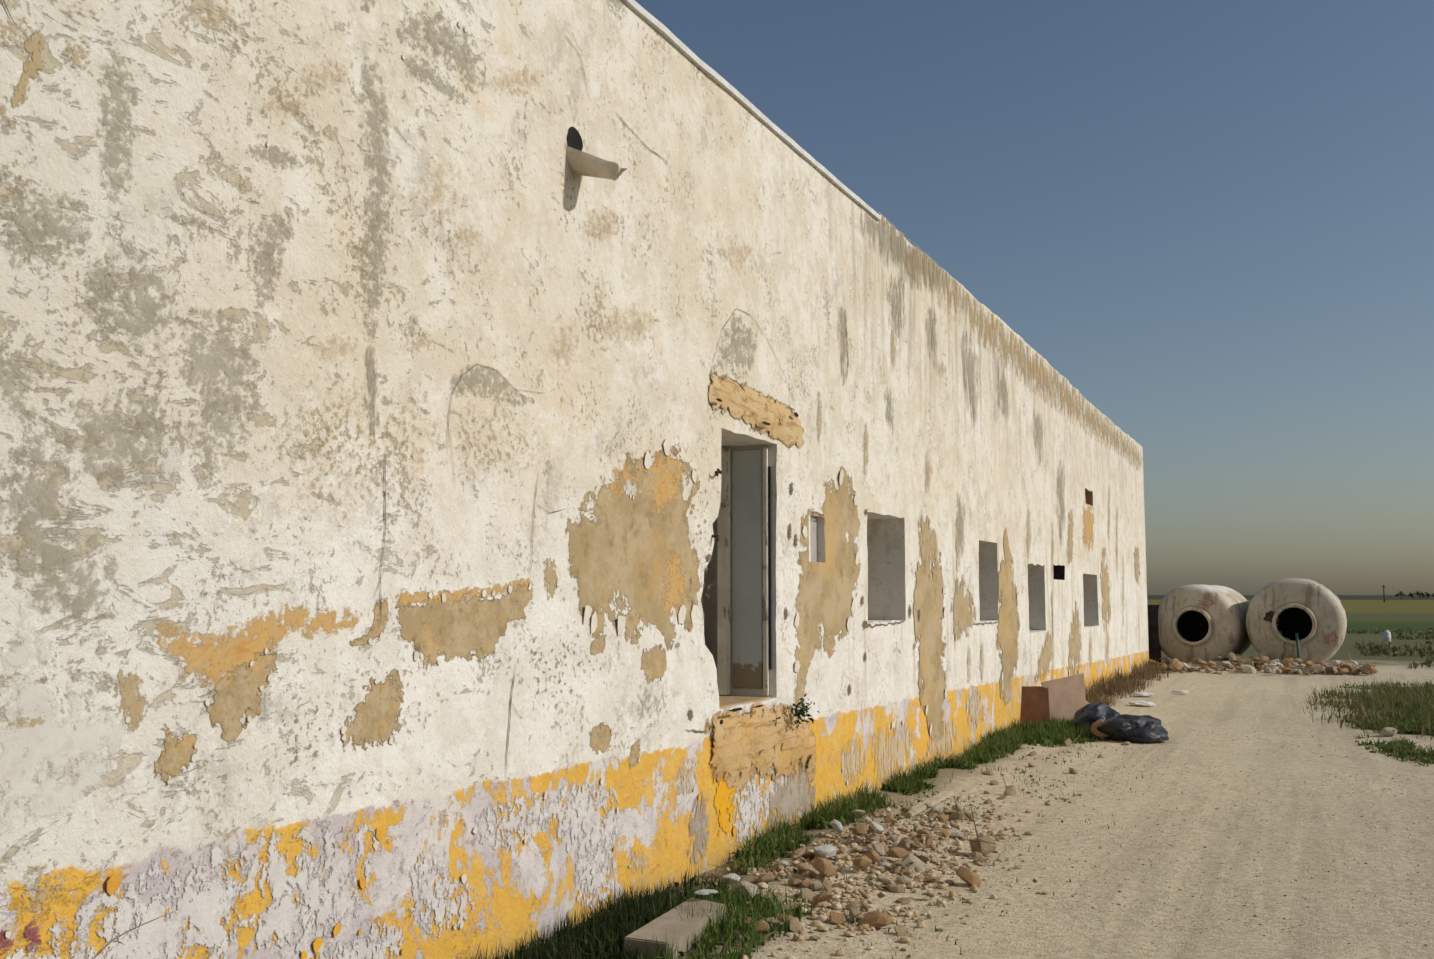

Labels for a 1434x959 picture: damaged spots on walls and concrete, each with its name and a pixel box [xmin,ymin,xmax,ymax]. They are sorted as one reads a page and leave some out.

flaking render [708,371,805,450]
flaking render [114,670,147,731]
flaking render [154,648,278,784]
flaking render [283,669,404,777]
flaking render [349,438,712,697]
flaking render [677,467,868,864]
flaking render [842,510,985,785]
leakage [956,494,965,554]
flaking render [997,529,1020,705]
flaking render [1035,600,1081,682]
leakage [1057,471,1065,540]